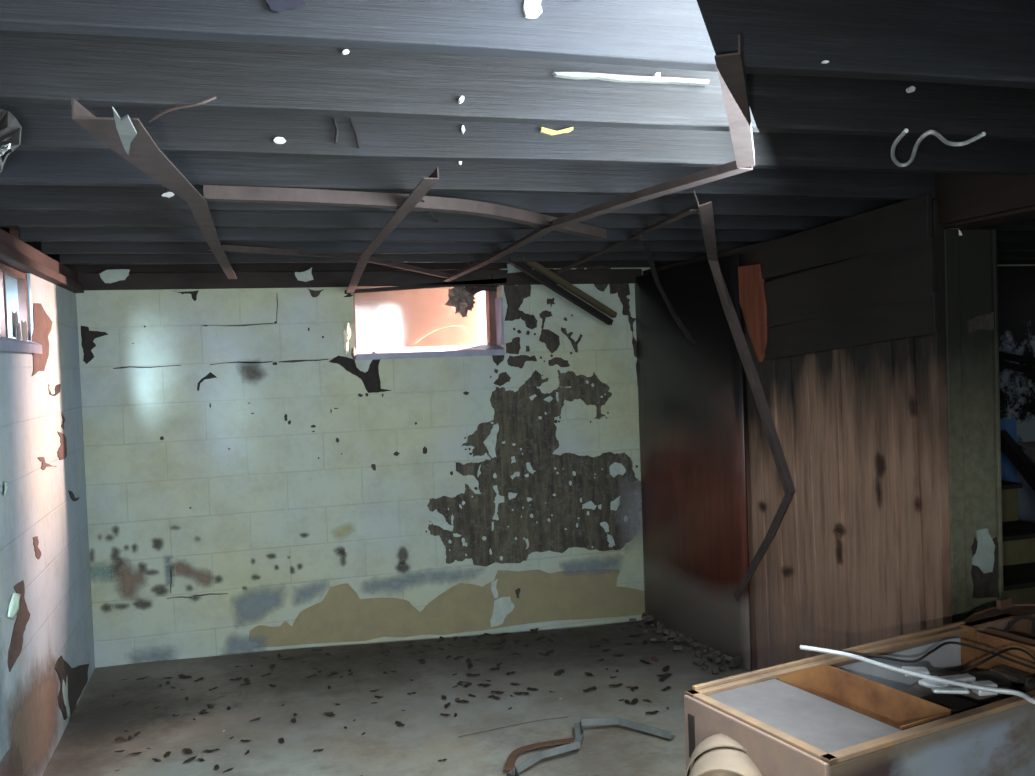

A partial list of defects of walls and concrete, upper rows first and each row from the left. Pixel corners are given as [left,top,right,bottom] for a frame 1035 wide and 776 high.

peeling [100,269,130,283]
peeling [81,326,109,364]
peeling [38,412,67,470]
peeling [249,264,645,647]
peeling [33,536,41,559]
damp [236,559,280,623]
damp [366,548,458,590]
peeling [971,528,999,598]
peeling [0,580,30,672]
damp [228,638,263,655]
spalling [55,656,89,723]
peeling [0,741,22,776]